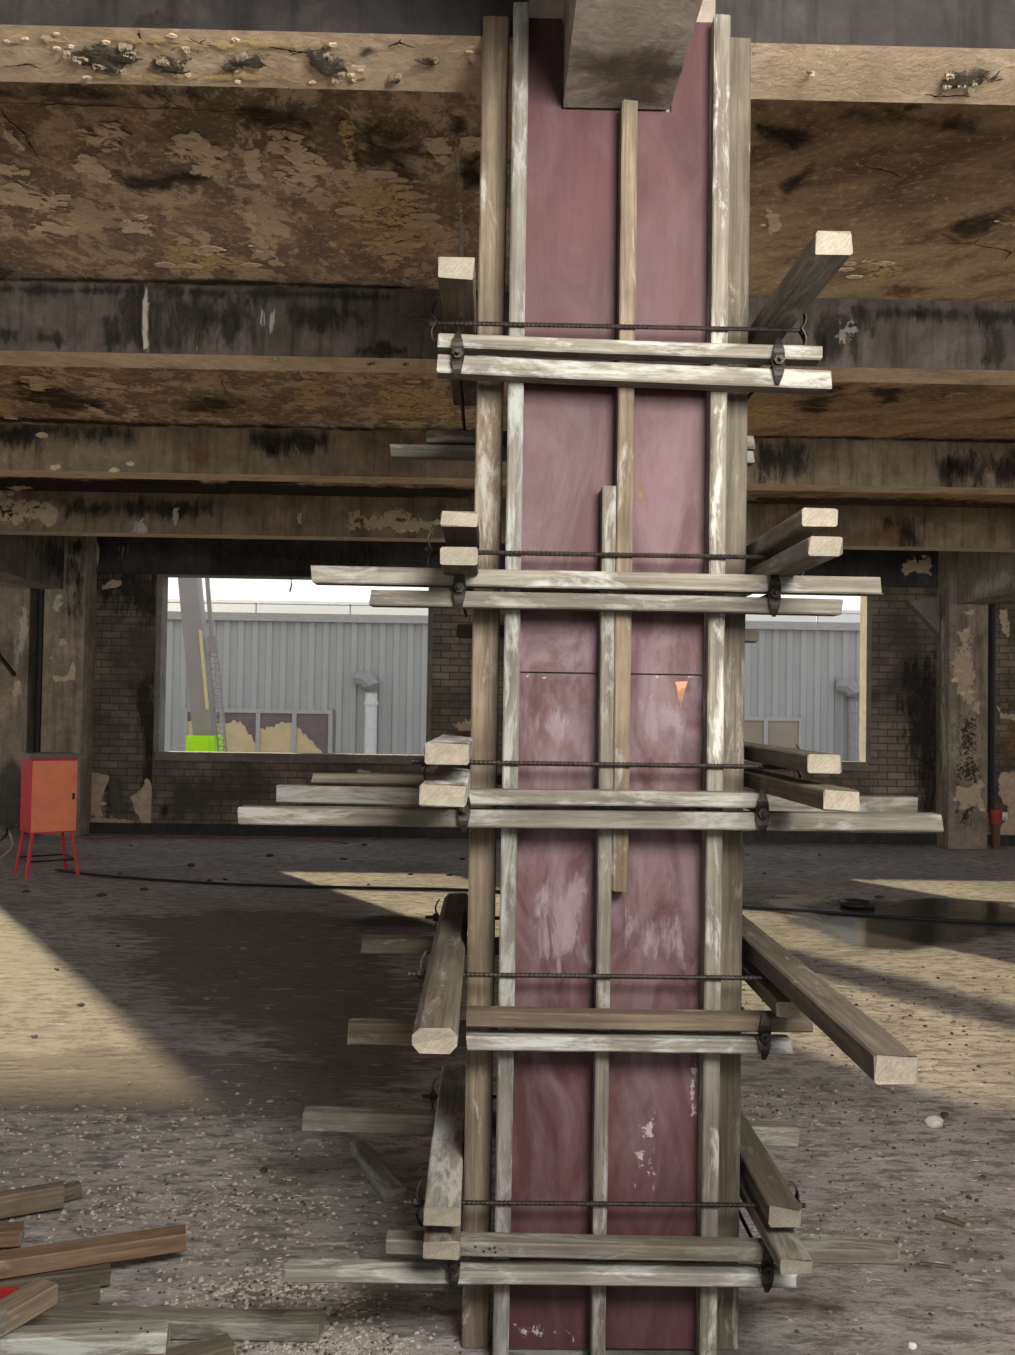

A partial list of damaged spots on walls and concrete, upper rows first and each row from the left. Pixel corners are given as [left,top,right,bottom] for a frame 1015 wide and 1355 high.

peeling [0,124,82,239]
peeling [68,121,130,185]
peeling [162,120,452,260]
peeling [420,136,481,166]
peeling [112,207,285,273]
damp [103,287,237,353]
damp [260,306,275,334]
peeling [0,485,59,528]
peeling [347,507,440,535]
peeling [901,555,933,580]
peeling [949,609,980,714]
peeling [953,775,986,812]